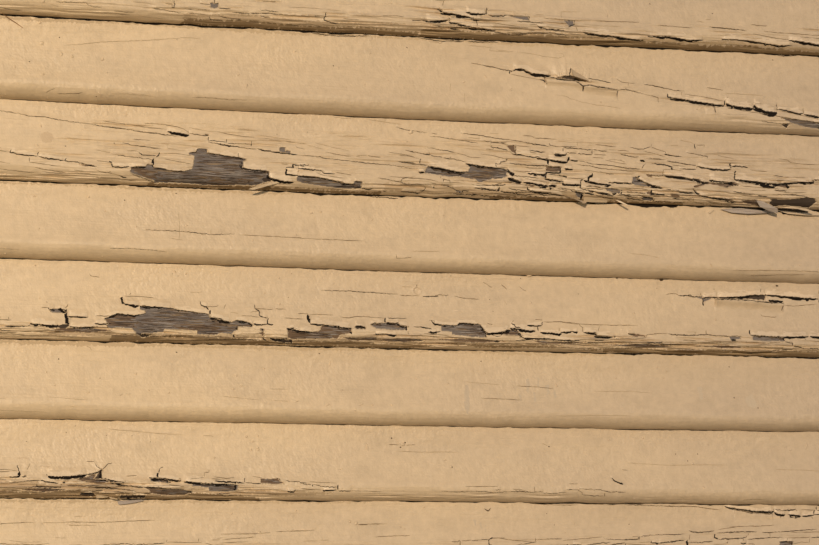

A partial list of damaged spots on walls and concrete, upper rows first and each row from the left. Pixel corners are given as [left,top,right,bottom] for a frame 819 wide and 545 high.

peeling [426,3,494,30]
peeling [585,28,702,40]
peeling [669,91,819,129]
peeling [110,149,361,190]
peeling [419,146,819,214]
peeling [698,286,819,302]
peeling [31,299,426,342]
peeling [430,310,671,348]
peeling [22,469,238,505]
crack [0,461,377,500]
crack [461,478,624,506]
crack [567,499,819,545]